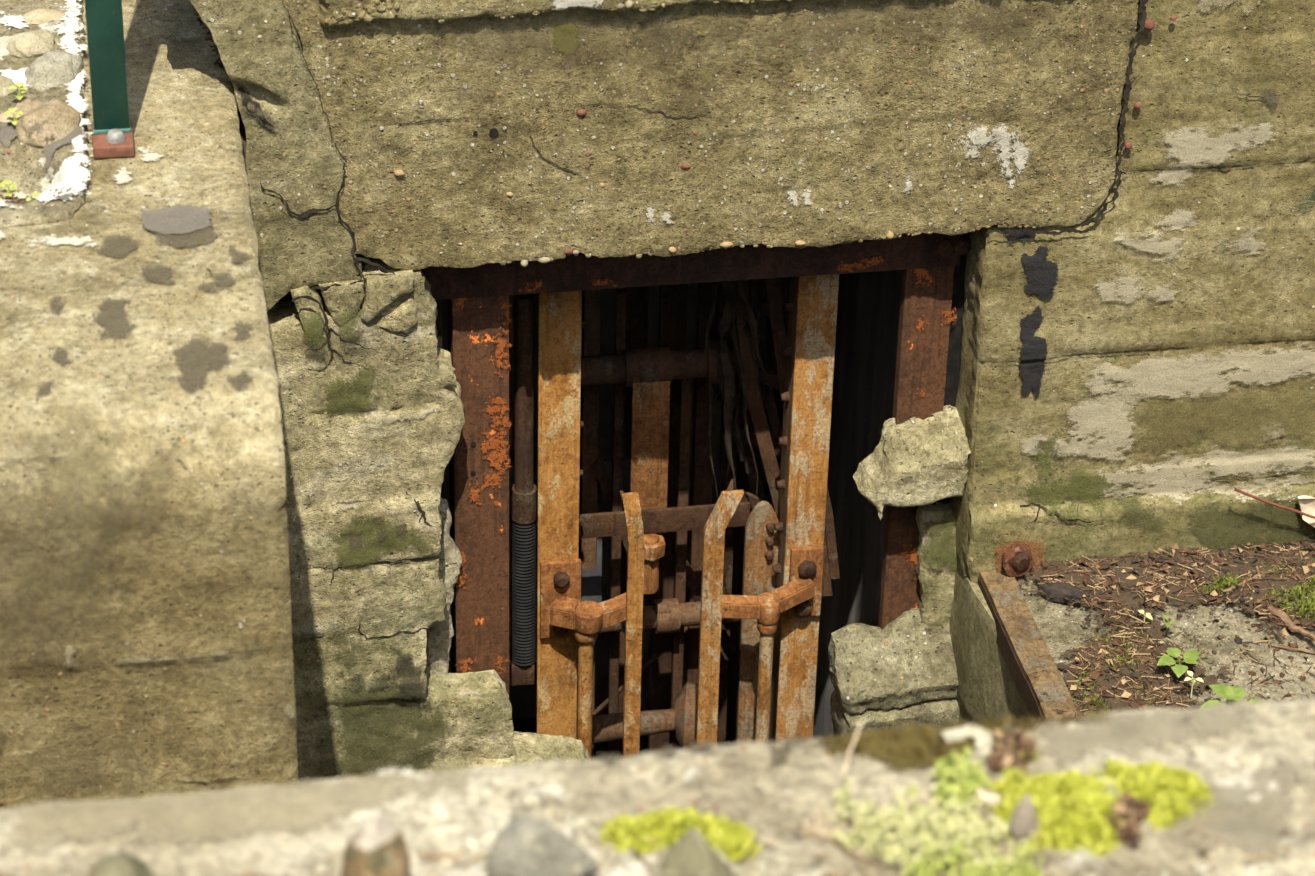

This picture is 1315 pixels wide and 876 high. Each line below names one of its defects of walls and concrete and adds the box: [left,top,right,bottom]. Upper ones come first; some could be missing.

water stain [28,234,99,248]
water stain [111,167,132,184]
water stain [137,147,164,161]
water stain [140,204,212,235]
crack [260,0,396,352]
crack [986,0,1149,235]
peeling [1094,208,1200,315]
peeling [1150,90,1280,186]
corrosion [490,279,544,377]
corrosion [916,307,957,334]
corrosion [467,396,514,505]
peeling [1038,341,1315,505]